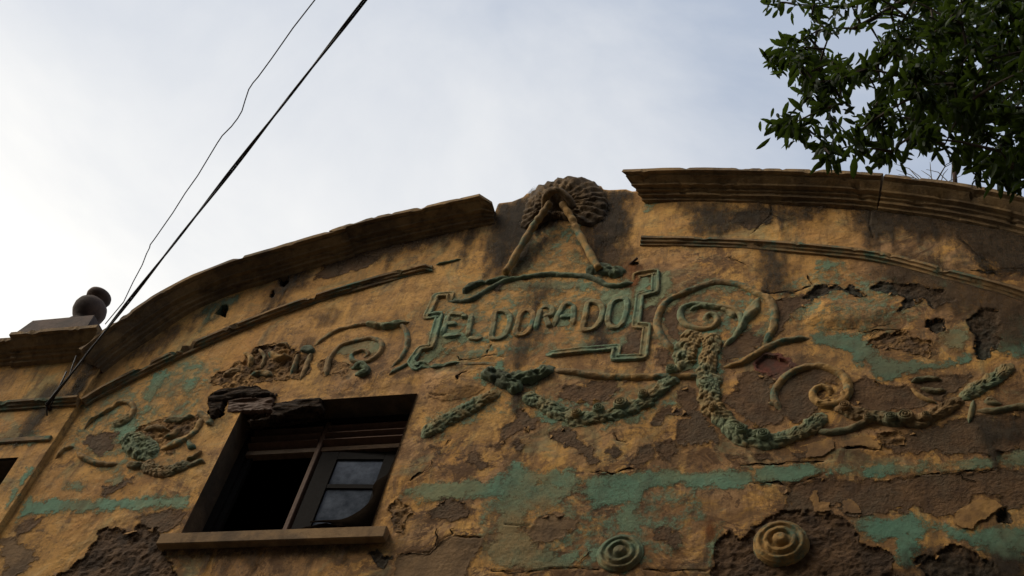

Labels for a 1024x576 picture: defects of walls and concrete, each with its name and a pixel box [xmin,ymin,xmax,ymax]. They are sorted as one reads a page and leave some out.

water stain [678,201,823,237]
spalling [774,281,950,358]
spalling [966,309,1003,360]
spalling [136,343,350,455]
spalling [52,507,187,576]
spalling [388,499,413,533]
peeling [426,497,469,522]
peeling [710,467,1024,576]